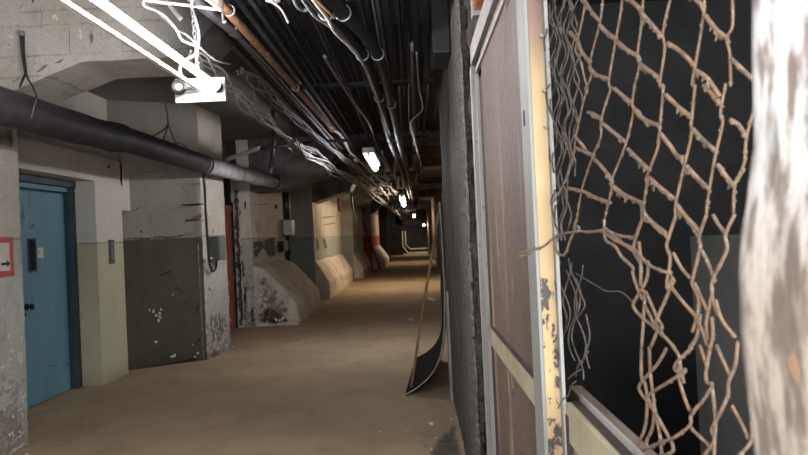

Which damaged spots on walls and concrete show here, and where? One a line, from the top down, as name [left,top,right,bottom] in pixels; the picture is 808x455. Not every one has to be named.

spalling [183,190,282,359]
leakage [259,278,288,324]